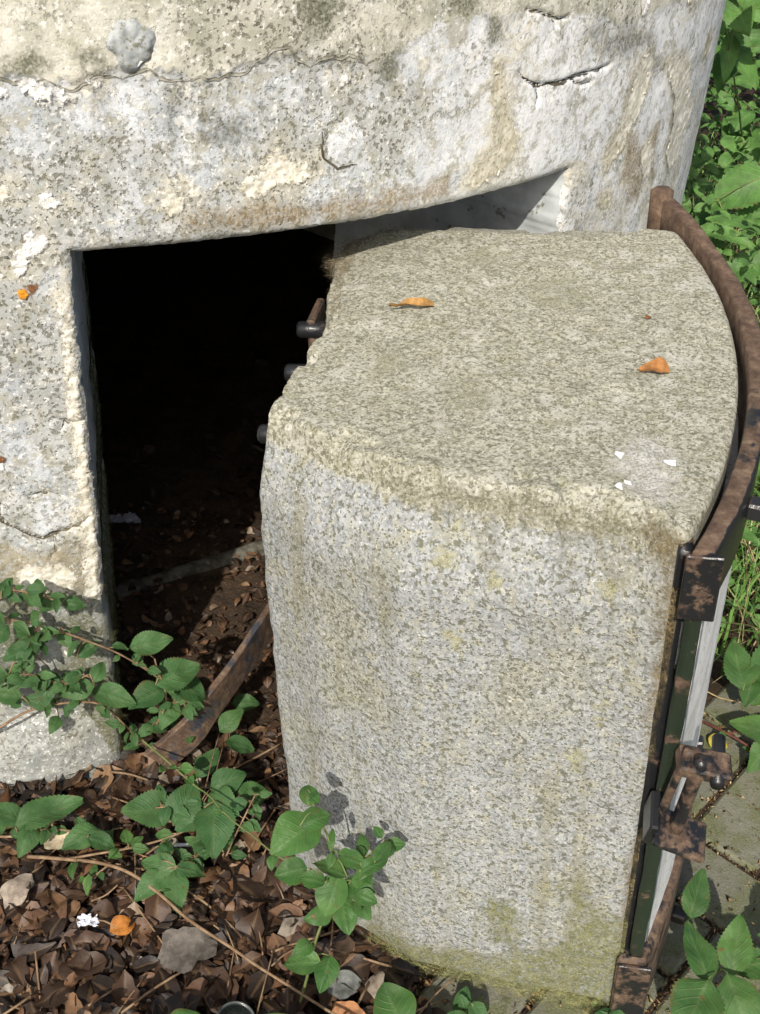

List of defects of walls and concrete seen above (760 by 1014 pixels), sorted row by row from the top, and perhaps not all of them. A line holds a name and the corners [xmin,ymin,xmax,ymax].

crack [526,8,565,22]
crack [519,66,603,99]
crack [0,502,82,554]